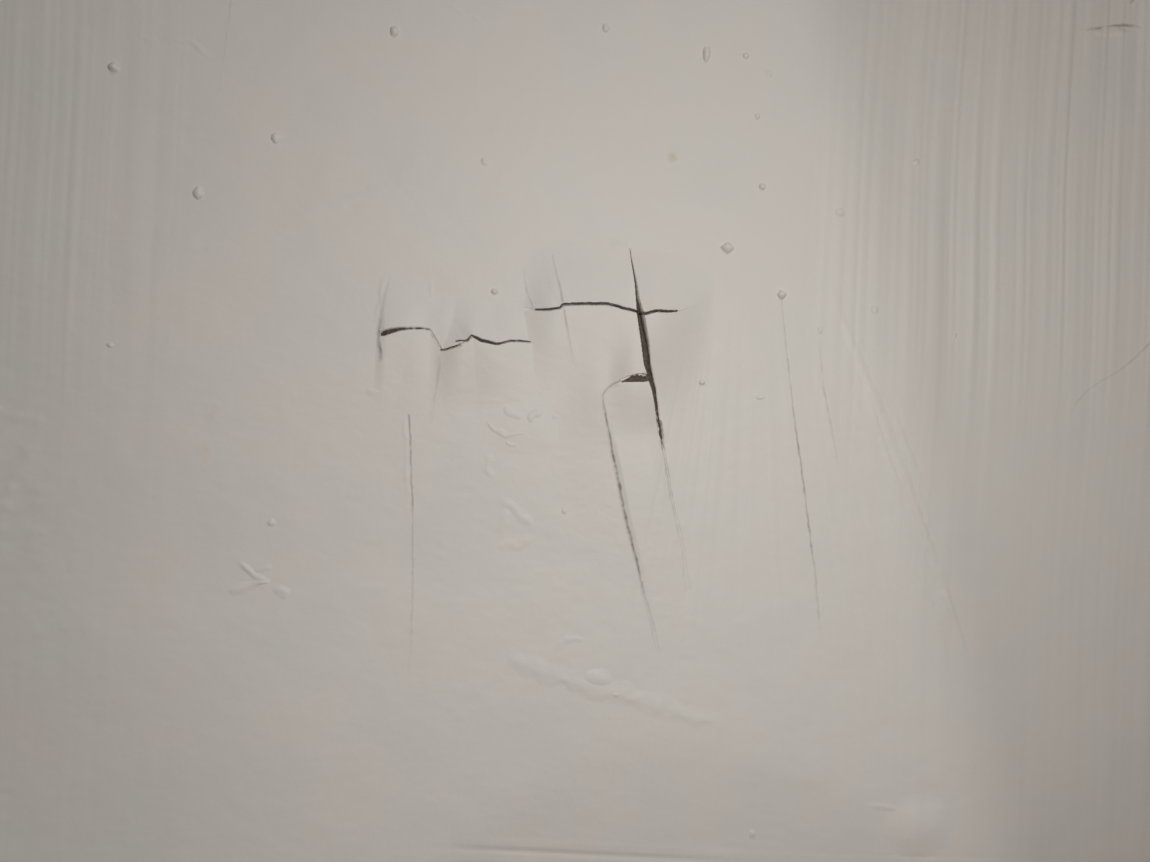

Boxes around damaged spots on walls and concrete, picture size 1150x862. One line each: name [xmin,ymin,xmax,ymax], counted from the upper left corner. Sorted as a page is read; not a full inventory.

crack [366,237,714,676]